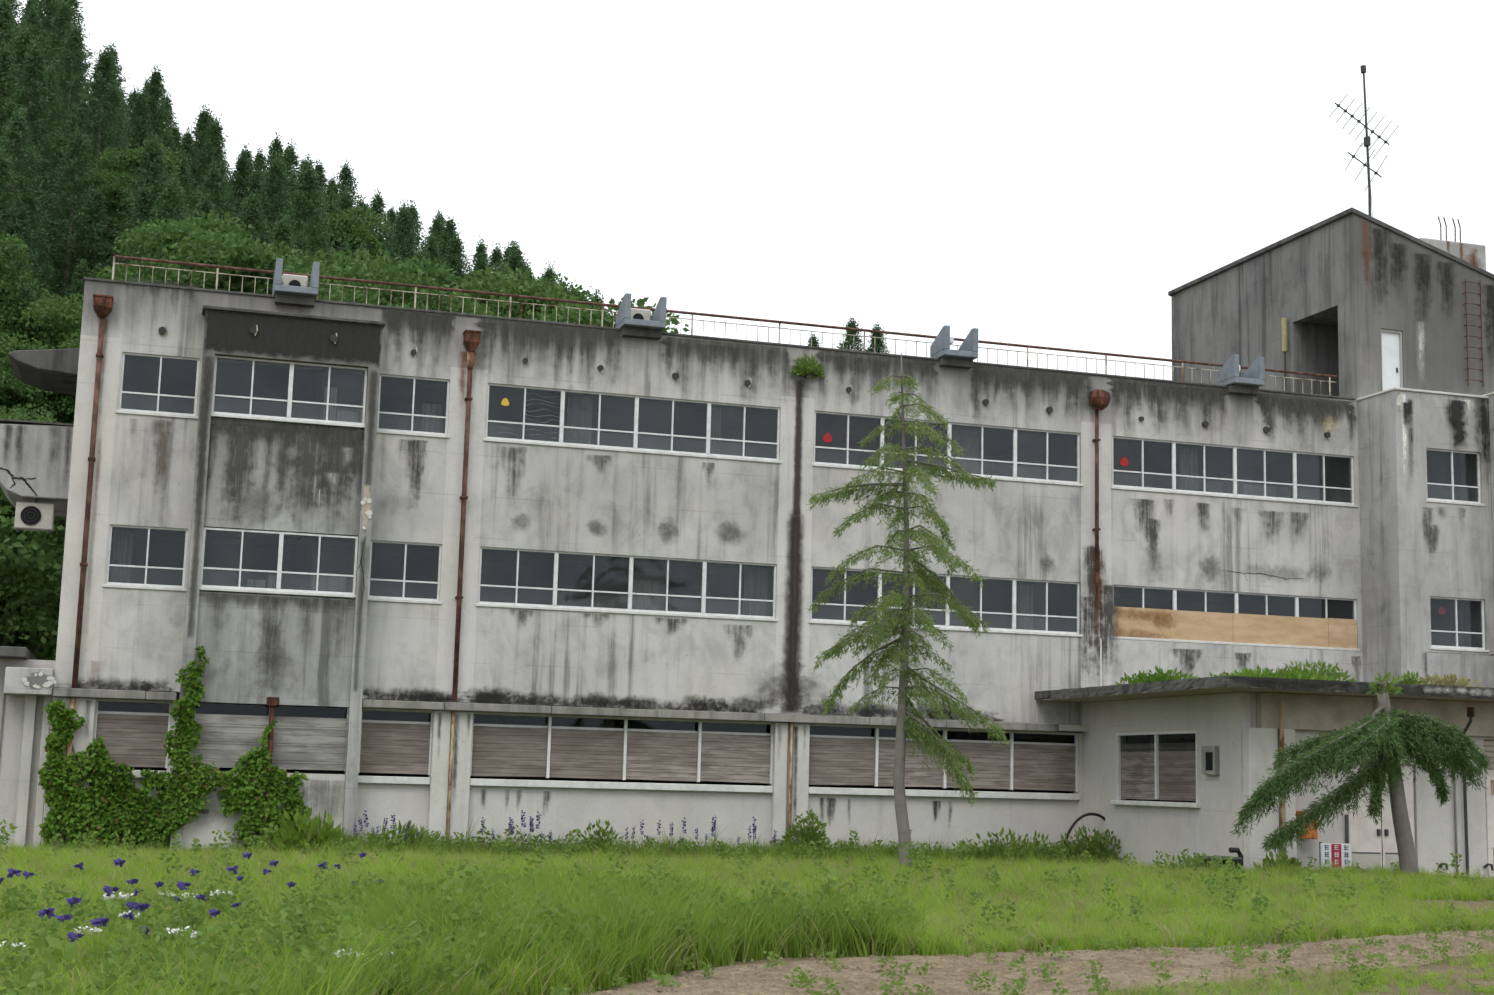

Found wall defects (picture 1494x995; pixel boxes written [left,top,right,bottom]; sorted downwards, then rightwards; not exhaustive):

water stain [1373,229,1453,312]
water stain [1486,285,1494,349]
water stain [817,350,938,399]
crack [0,467,38,496]
water stain [188,308,456,663]
water stain [354,337,897,807]
water stain [918,708,1002,721]